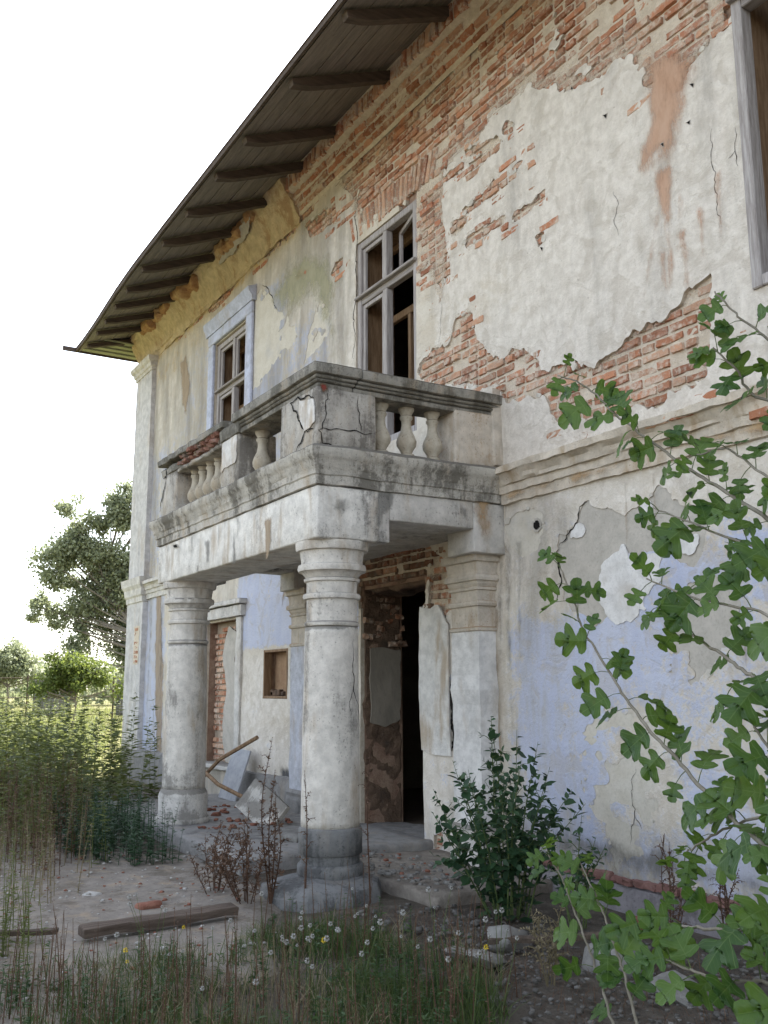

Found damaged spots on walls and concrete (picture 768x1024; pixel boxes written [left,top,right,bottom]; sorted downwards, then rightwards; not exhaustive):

spalling [253,0,732,311]
crack [710,129,738,216]
spalling [178,283,237,340]
spalling [419,276,717,439]
spalling [176,431,237,473]
crack [290,394,372,450]
spalling [749,406,768,421]
spalling [359,546,451,617]
peeling [504,506,545,557]
crack [556,502,585,598]
peeling [558,485,707,626]
peeling [664,575,741,685]